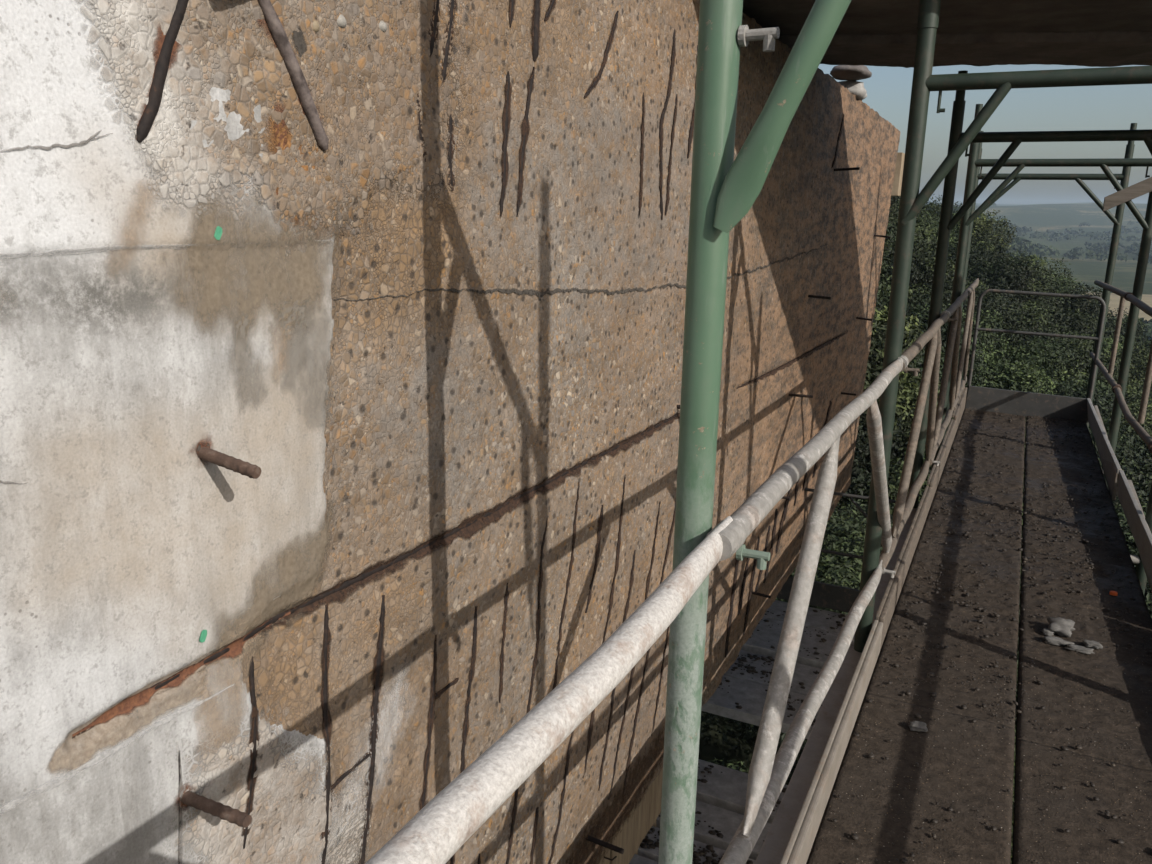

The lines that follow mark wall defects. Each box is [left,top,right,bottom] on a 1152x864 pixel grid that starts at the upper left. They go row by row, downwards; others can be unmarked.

crack [0,130,113,152]
corrosion [270,106,318,171]
spalling [734,11,792,160]
damp [175,197,338,415]
crack [334,283,686,301]
crack [727,244,828,279]
spalling [712,68,900,529]
spalling [49,0,700,864]
corrosion [72,612,291,737]
damp [200,508,331,746]
spalling [701,416,860,709]